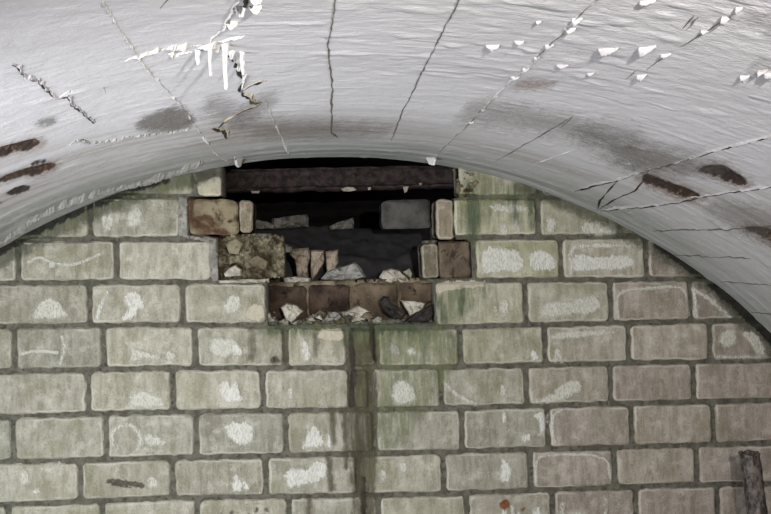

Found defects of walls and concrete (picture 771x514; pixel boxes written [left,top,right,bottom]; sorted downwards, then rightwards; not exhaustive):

peeling [224,0,263,31]
crack [12,0,289,165]
leakage [135,104,193,132]
crack [327,0,338,138]
crack [392,0,459,138]
spalling [225,157,436,169]
spalling [223,188,457,229]
crack [575,134,771,213]
spalling [218,234,286,280]
leakage [481,184,771,359]
leakage [284,323,416,514]
leakage [534,380,581,443]